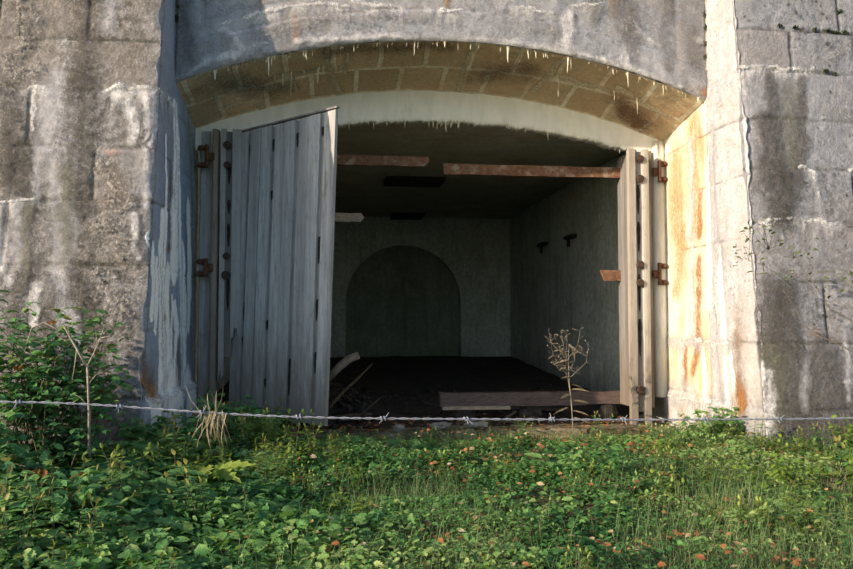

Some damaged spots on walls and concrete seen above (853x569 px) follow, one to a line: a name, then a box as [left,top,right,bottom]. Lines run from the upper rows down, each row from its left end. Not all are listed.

water stain [0,0,198,432]
water stain [737,65,841,244]
rust [682,256,701,393]
water stain [755,271,853,447]